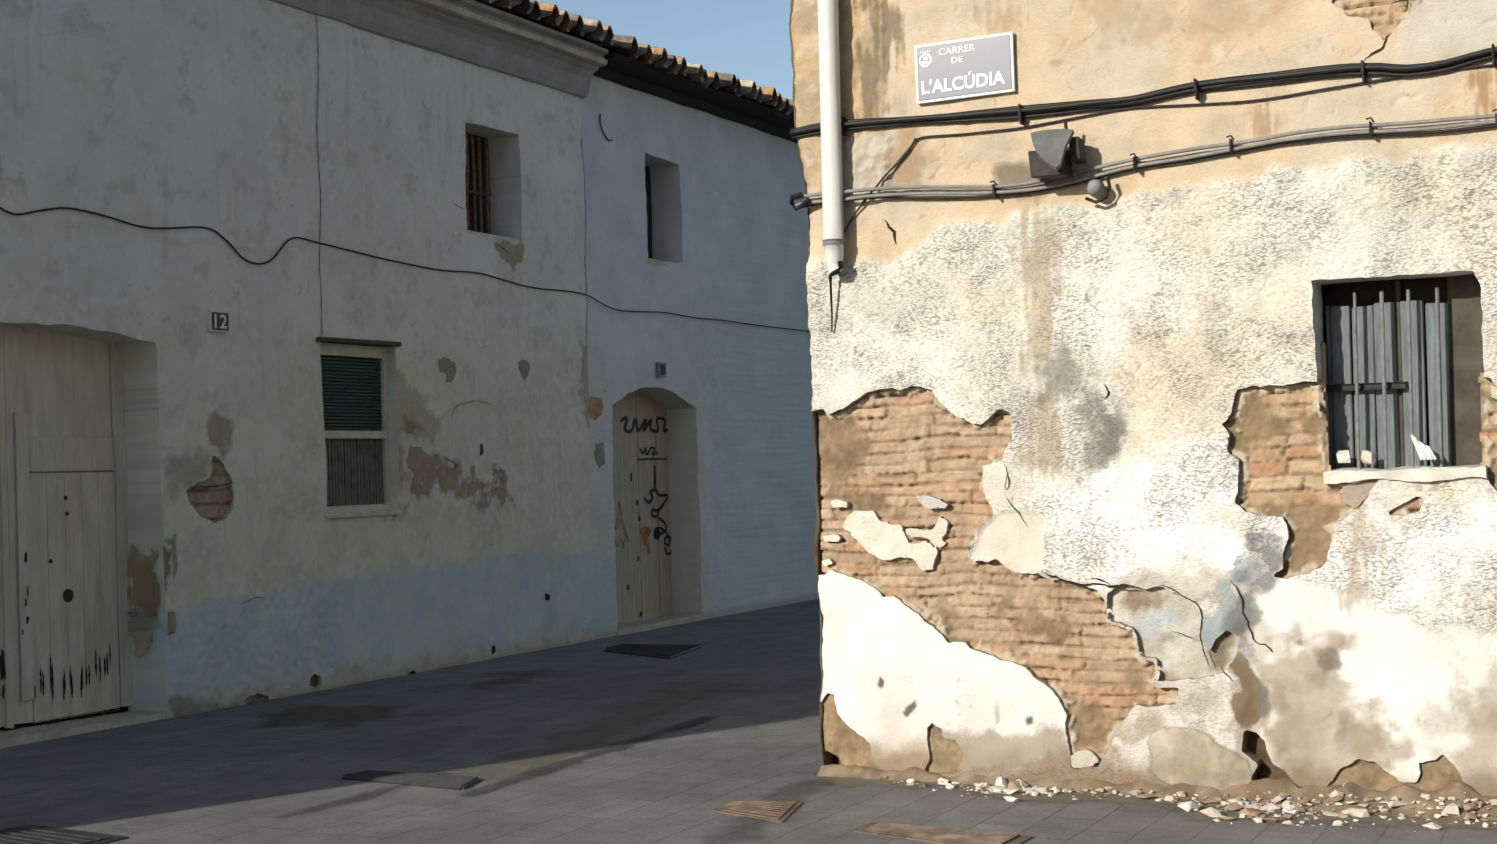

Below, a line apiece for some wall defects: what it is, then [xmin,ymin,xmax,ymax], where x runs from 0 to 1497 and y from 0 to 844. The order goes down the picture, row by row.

flaking render [1332,0,1423,40]
flaking render [587,396,603,420]
flaking render [1478,373,1497,490]
flaking render [186,456,233,523]
flaking render [1224,379,1379,579]
flaking render [1390,497,1423,515]
peeling [127,545,176,656]
flaking render [817,386,1240,773]
spalling [1247,731,1294,782]
flaking render [1329,755,1463,792]